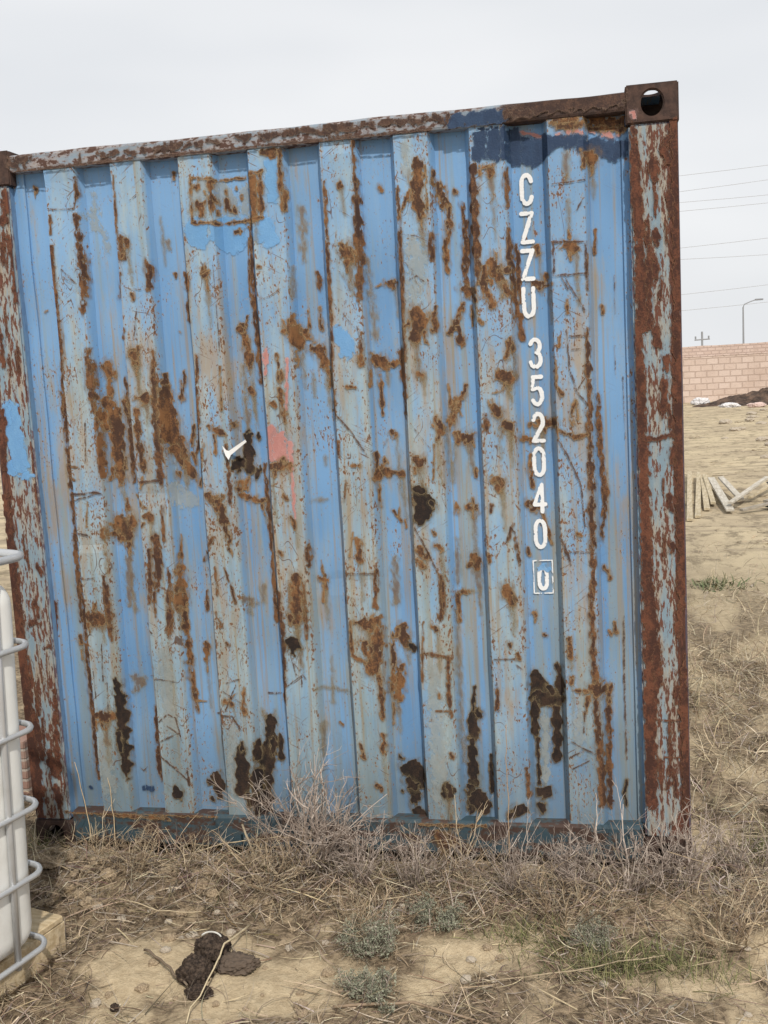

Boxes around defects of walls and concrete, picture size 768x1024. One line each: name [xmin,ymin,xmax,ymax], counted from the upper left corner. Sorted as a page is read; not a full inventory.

rust [0,112,629,852]
rust [502,88,690,813]